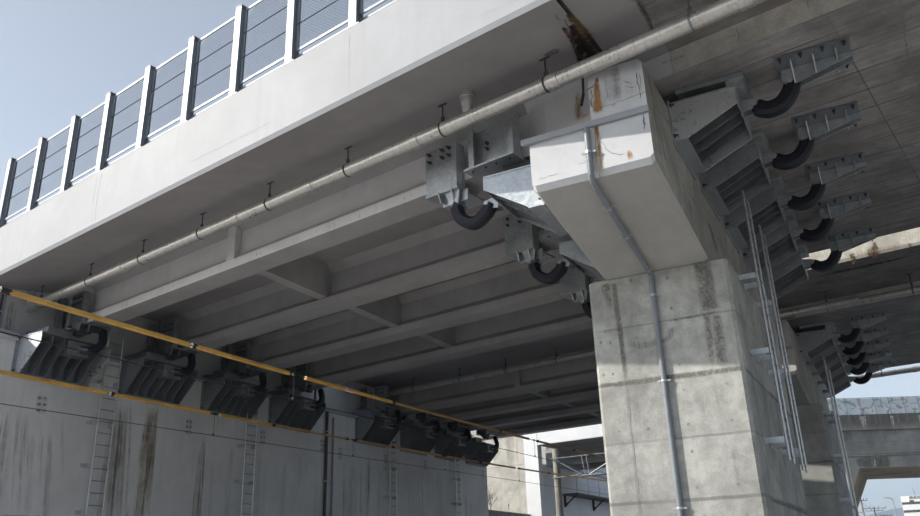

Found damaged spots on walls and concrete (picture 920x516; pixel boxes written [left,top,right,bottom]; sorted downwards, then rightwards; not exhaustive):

damp [556,0,598,62]
rust [575,80,601,118]
crack [586,74,646,129]
damp [603,285,625,367]
damp [695,262,723,361]